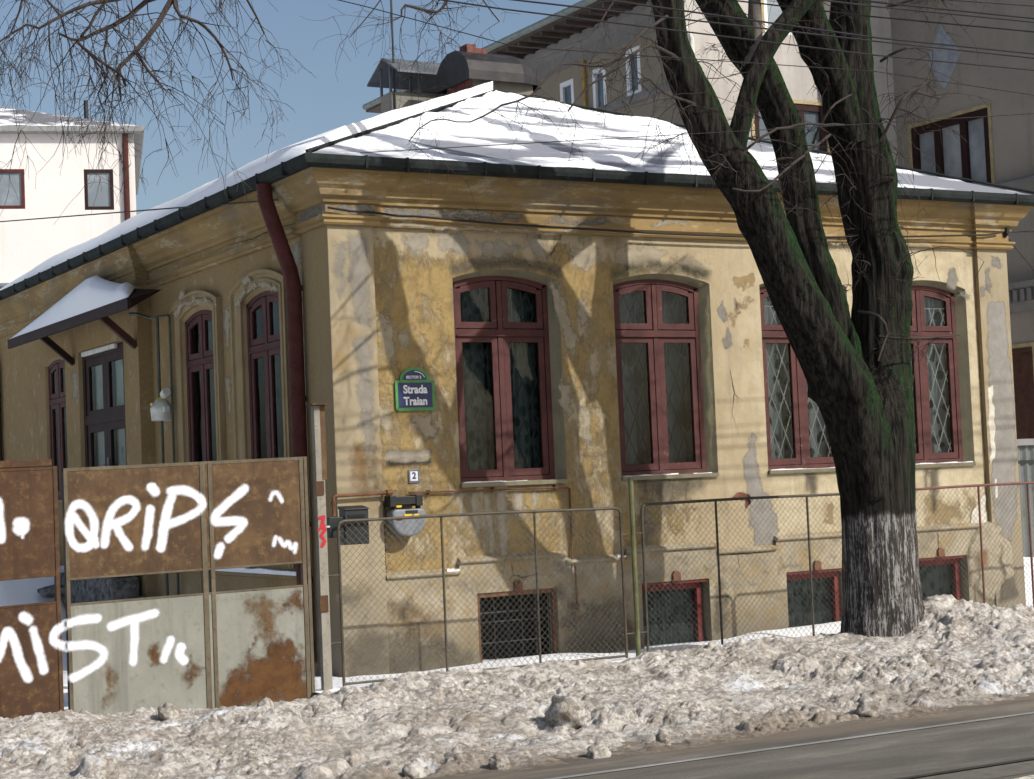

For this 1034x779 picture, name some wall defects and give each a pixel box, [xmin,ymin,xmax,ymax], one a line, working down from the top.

peeling [335,237,410,458]
peeling [549,282,588,351]
peeling [717,273,755,349]
peeling [558,379,592,447]
peeling [925,256,1018,541]
peeling [731,434,779,546]
corrosion [149,645,159,664]
corrosion [185,662,200,681]
corrosion [219,591,317,707]
leakage [348,629,468,677]